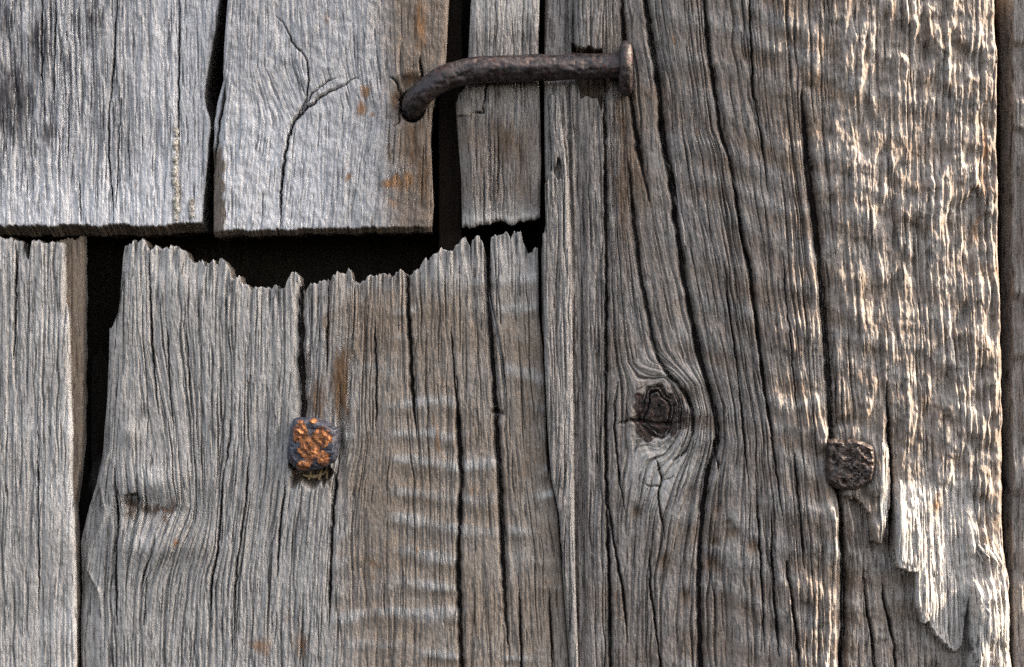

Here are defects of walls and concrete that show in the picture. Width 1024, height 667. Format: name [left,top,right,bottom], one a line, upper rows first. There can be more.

crack [276,16,355,228]
corrosion [392,71,415,111]
corrosion [293,351,348,470]